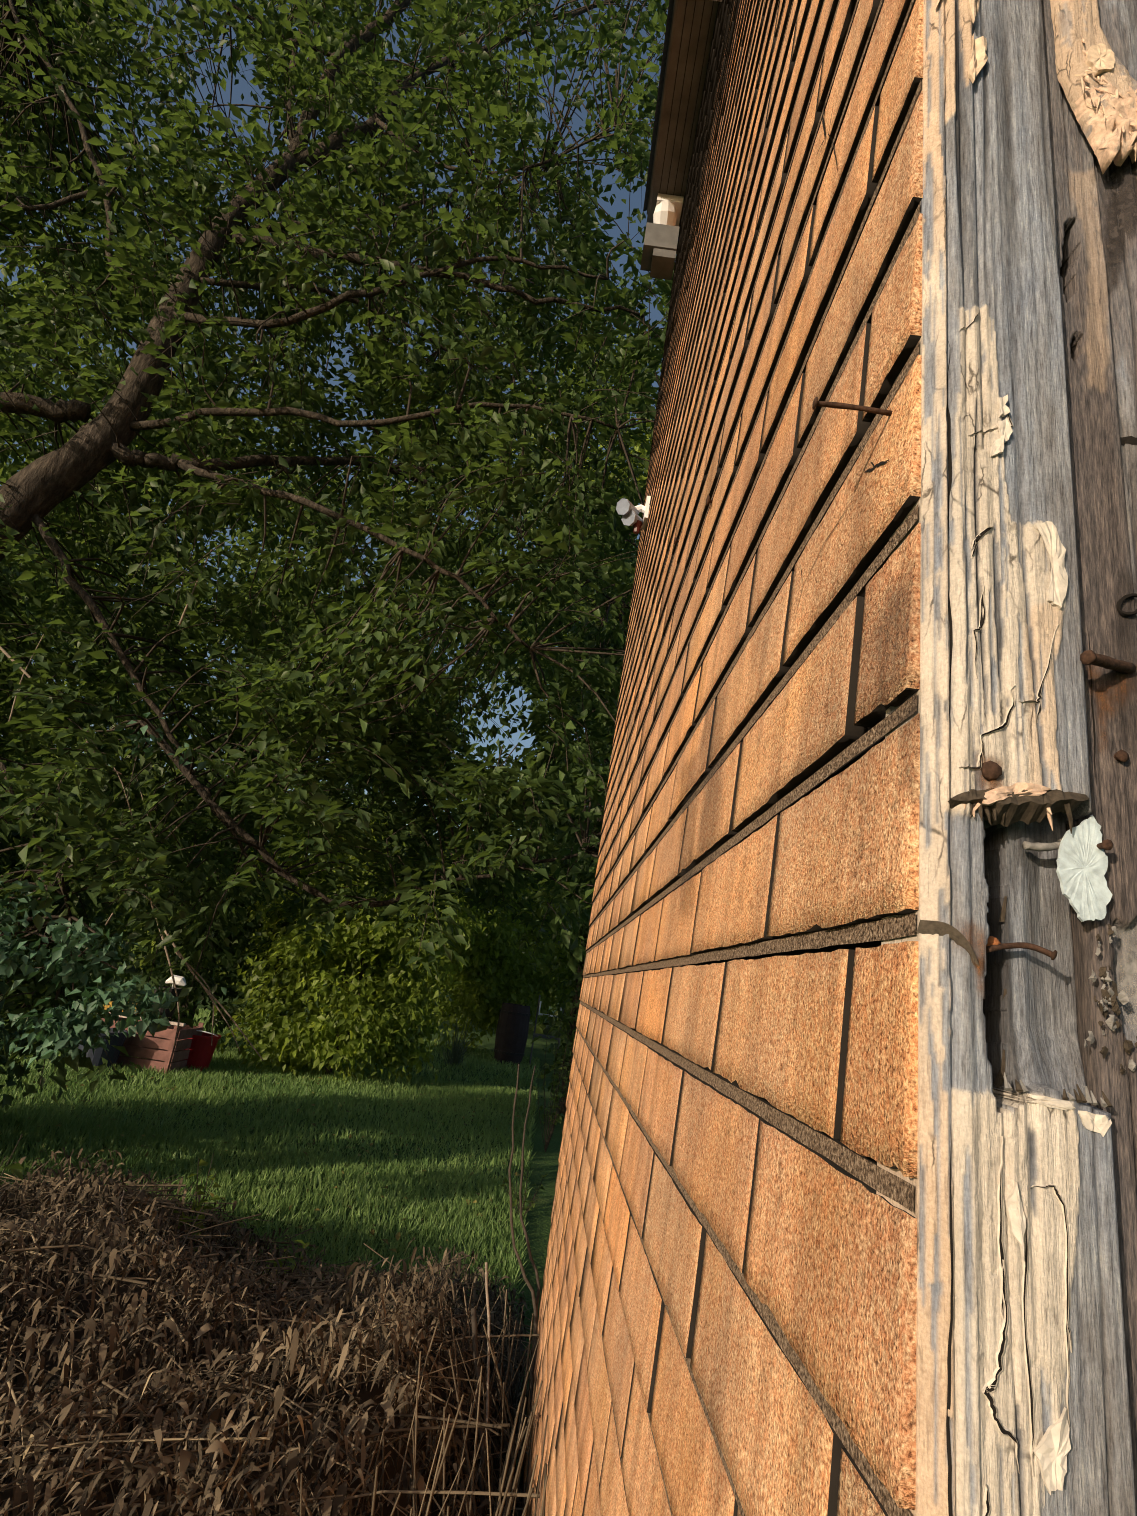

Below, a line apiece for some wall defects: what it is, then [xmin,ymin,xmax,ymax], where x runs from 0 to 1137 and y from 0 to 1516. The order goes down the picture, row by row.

peeling [967,0,988,83]
peeling [1085,43,1115,77]
peeling [990,395,1013,457]
peeling [1034,521,1068,609]
rust [968,936,1001,993]
peeling [1056,815,1137,1074]
peeling [1005,1182,1026,1261]
crack [946,1130,1072,1516]
peeling [1033,1407,1071,1495]